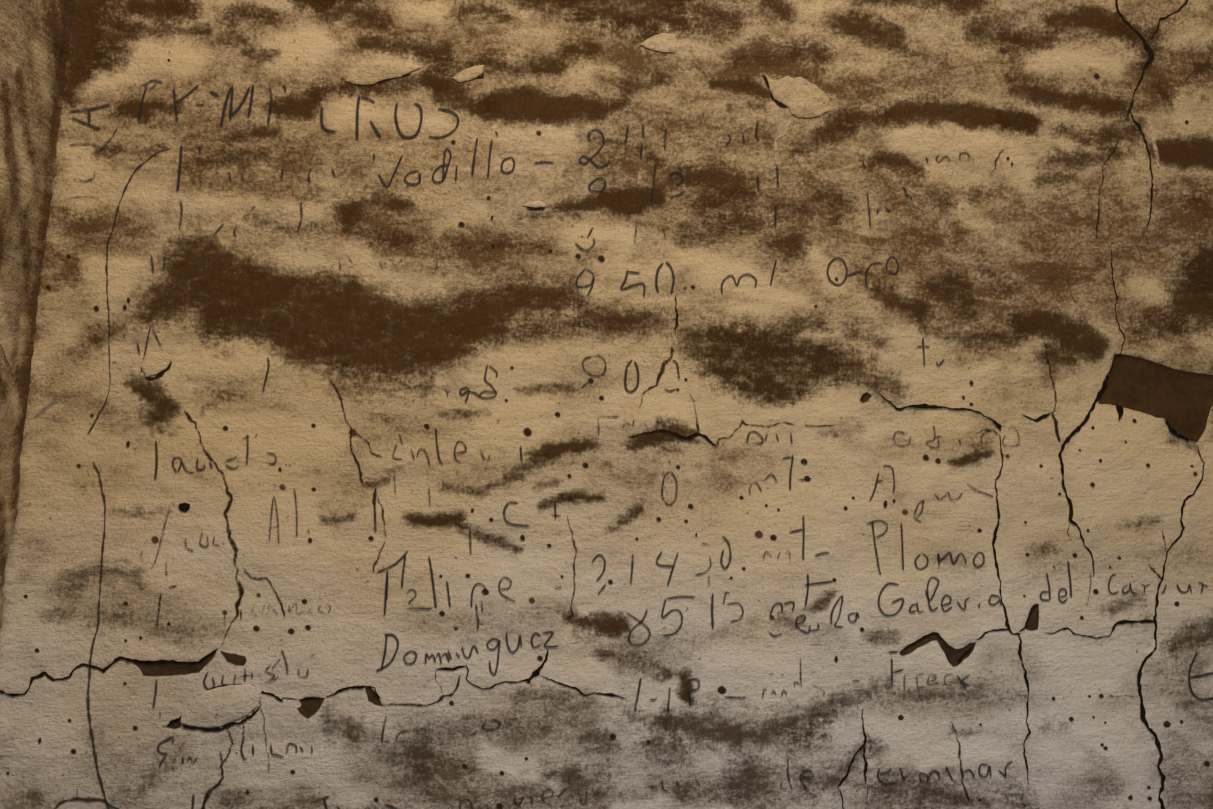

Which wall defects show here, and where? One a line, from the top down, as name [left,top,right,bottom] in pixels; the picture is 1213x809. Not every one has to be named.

crack [630,296,834,446]
crack [879,0,1205,809]
spalling [1096,354,1213,442]
spalling [131,649,247,676]
spalling [297,697,325,718]
spalling [365,686,383,706]
crack [163,648,625,809]
crack [837,710,868,809]
spalling [899,632,976,667]